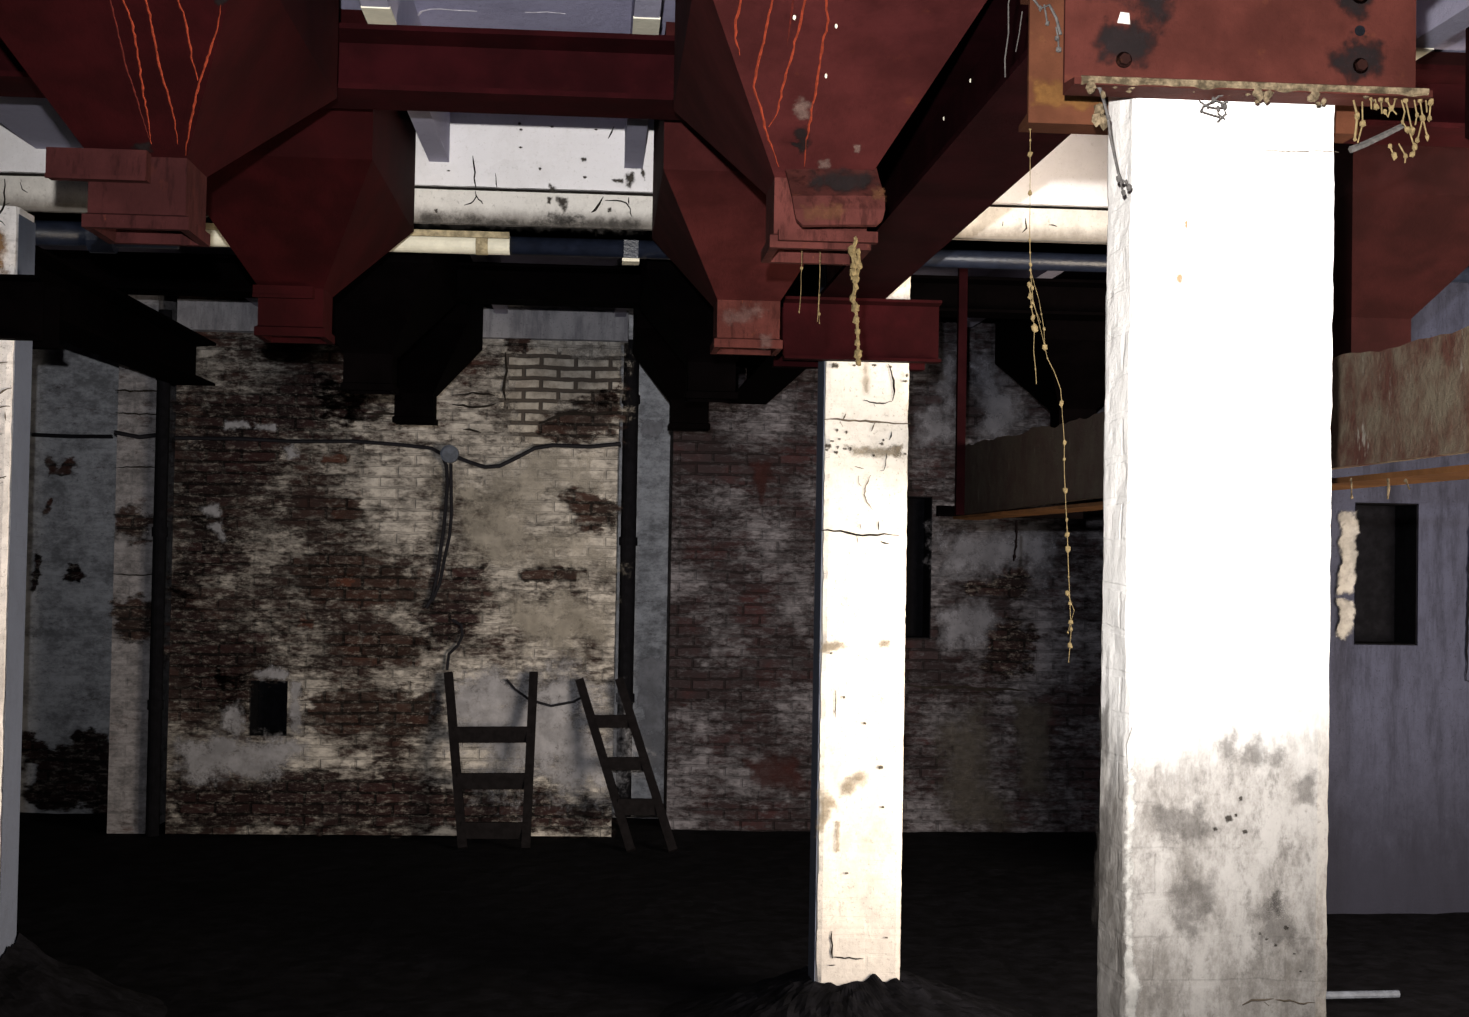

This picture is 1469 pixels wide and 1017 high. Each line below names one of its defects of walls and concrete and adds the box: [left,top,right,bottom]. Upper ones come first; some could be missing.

corrosion [734,0,742,56]
corrosion [110,0,221,156]
corrosion [753,0,806,167]
corrosion [804,0,830,167]
corrosion [1035,85,1097,108]
peeling [504,338,532,354]
peeling [535,382,630,459]
peeling [558,486,622,535]
peeling [519,566,588,585]